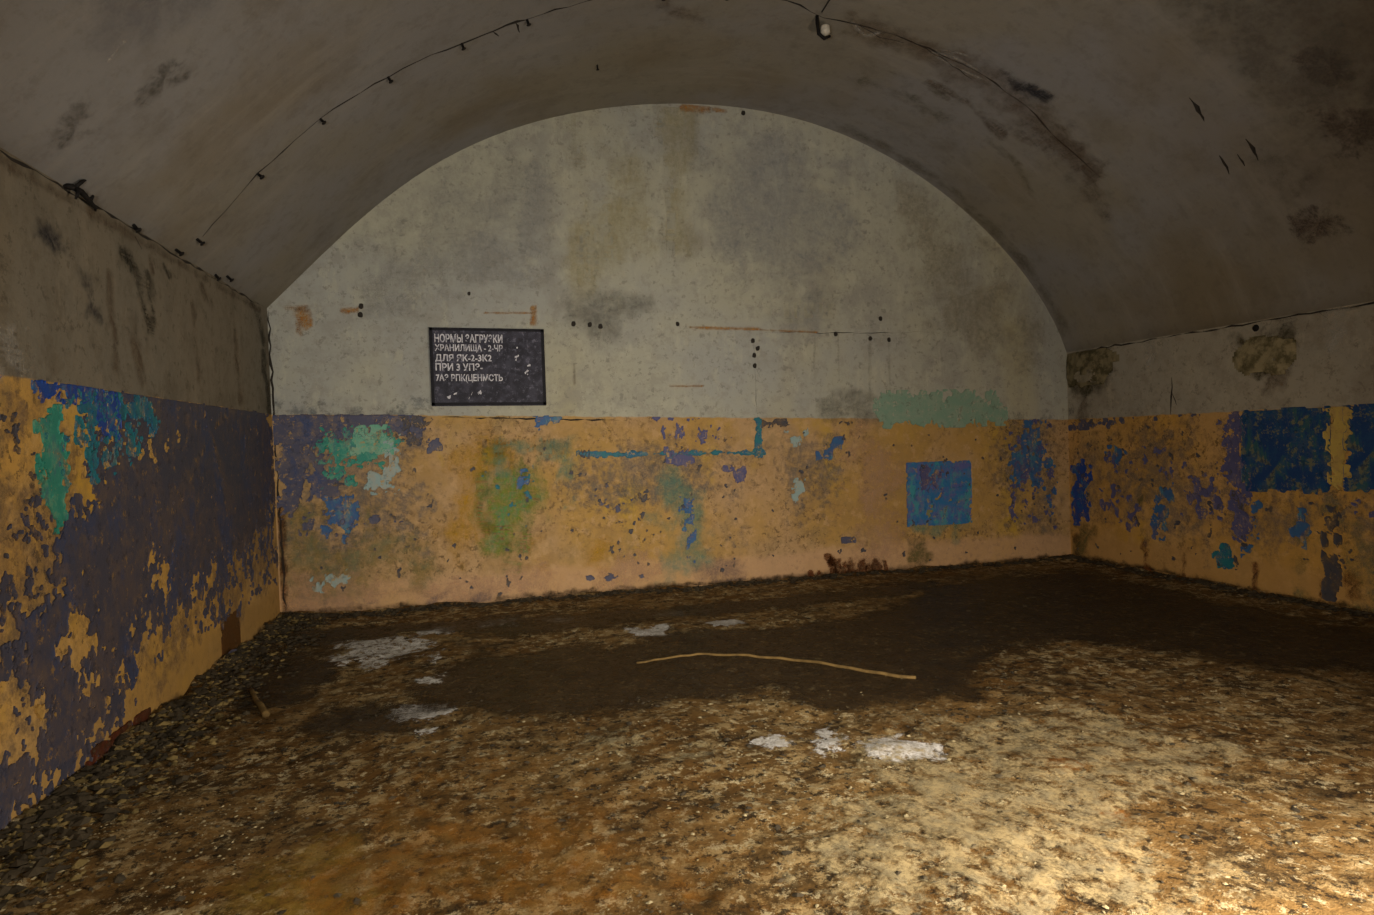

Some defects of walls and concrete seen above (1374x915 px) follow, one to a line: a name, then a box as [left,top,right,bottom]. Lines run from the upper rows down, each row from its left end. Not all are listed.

peeling [0,388,434,830]
peeling [497,468,542,596]
peeling [569,450,692,578]
peeling [685,529,697,563]
peeling [652,417,766,471]
peeling [760,418,860,480]
peeling [975,411,1279,570]
peeling [1289,499,1374,569]